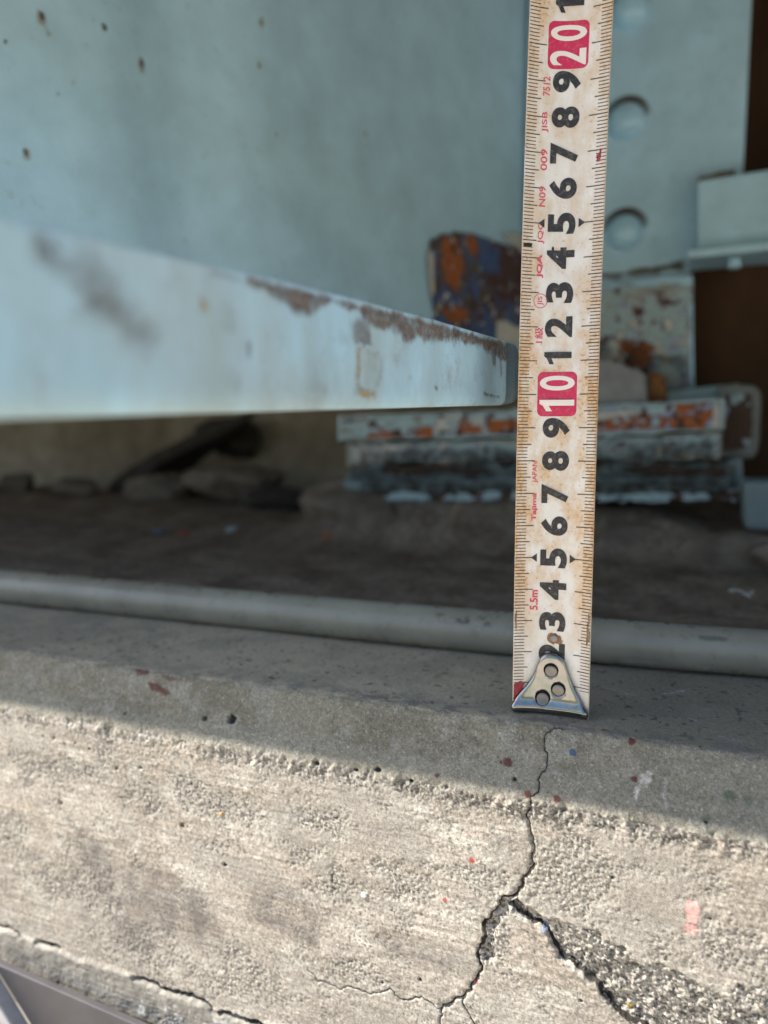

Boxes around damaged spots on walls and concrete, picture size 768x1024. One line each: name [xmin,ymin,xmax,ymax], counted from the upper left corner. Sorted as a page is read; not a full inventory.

crack [310,727,561,1024]
crack [0,924,60,946]
crack [136,977,263,1024]